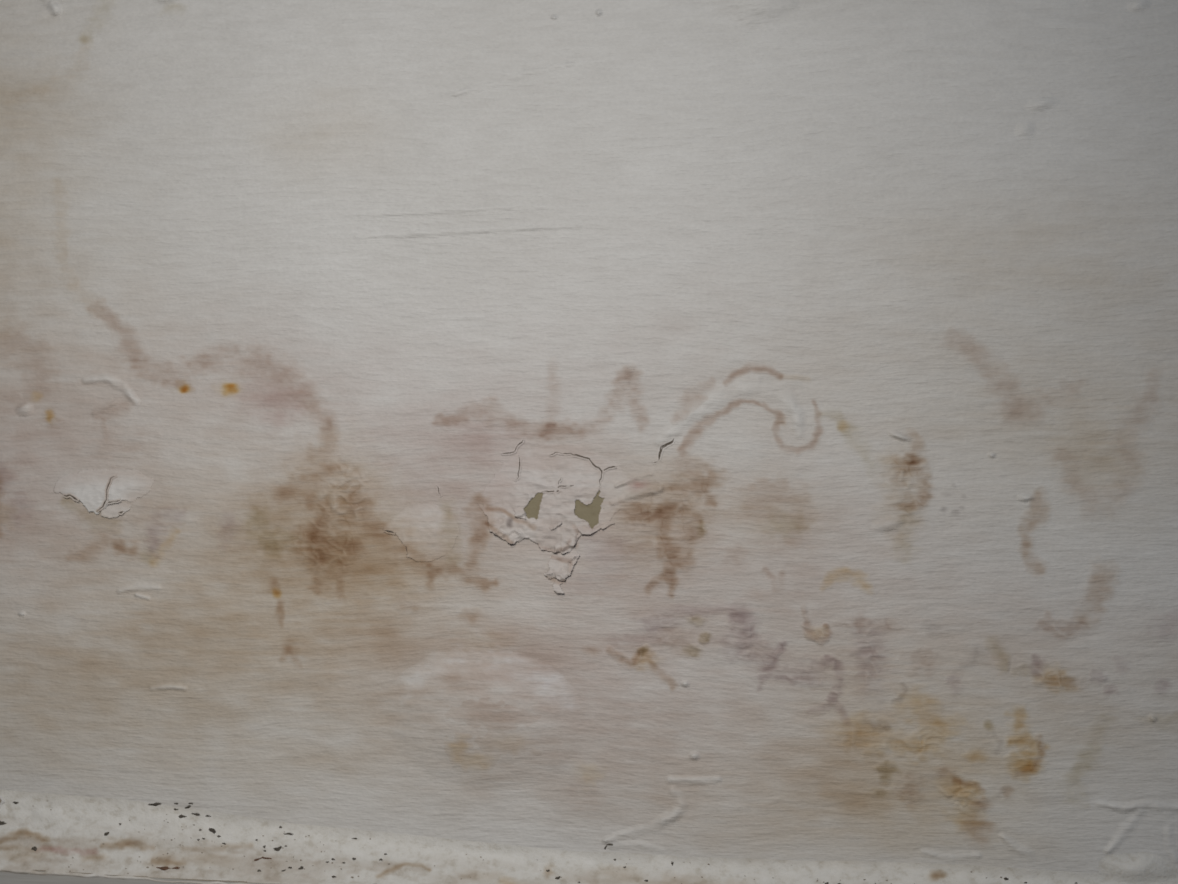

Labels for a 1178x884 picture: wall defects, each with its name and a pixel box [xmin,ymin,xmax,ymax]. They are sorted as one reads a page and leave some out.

leakage [0,452,38,541]
leakage [0,314,64,410]
peeling [54,468,155,518]
leakage [46,174,532,670]
peeling [477,444,631,594]
leakage [417,323,1178,852]